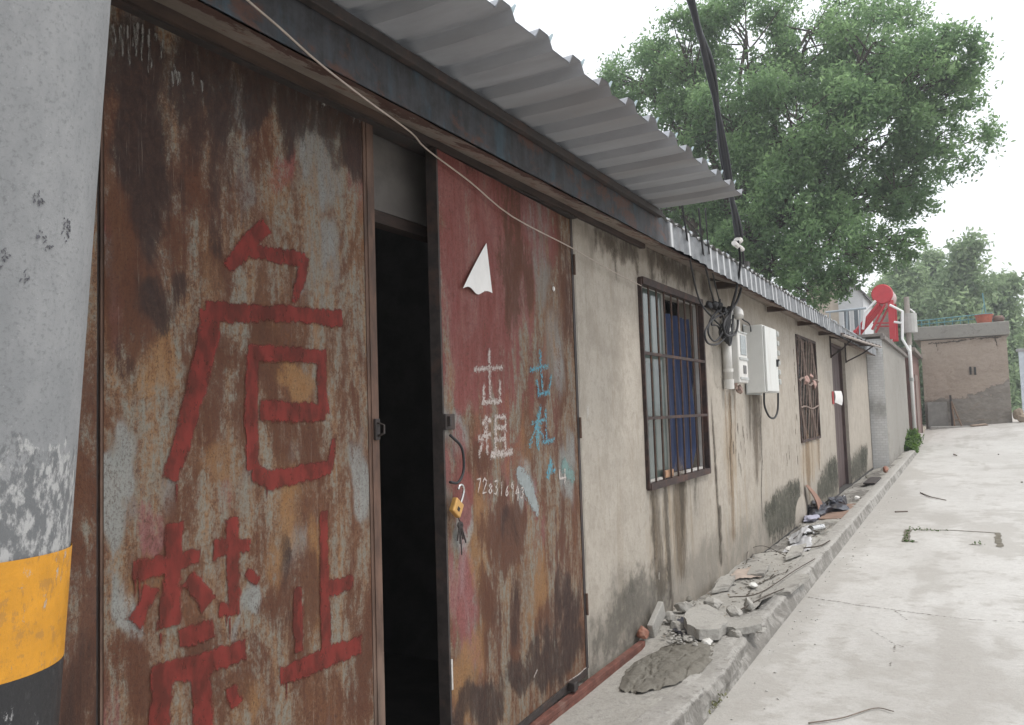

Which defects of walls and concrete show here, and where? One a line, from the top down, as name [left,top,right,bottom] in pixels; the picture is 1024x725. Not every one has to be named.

leakage [765,478,800,543]
leakage [817,458,839,502]
leakage [851,444,869,487]
leakage [595,464,696,652]